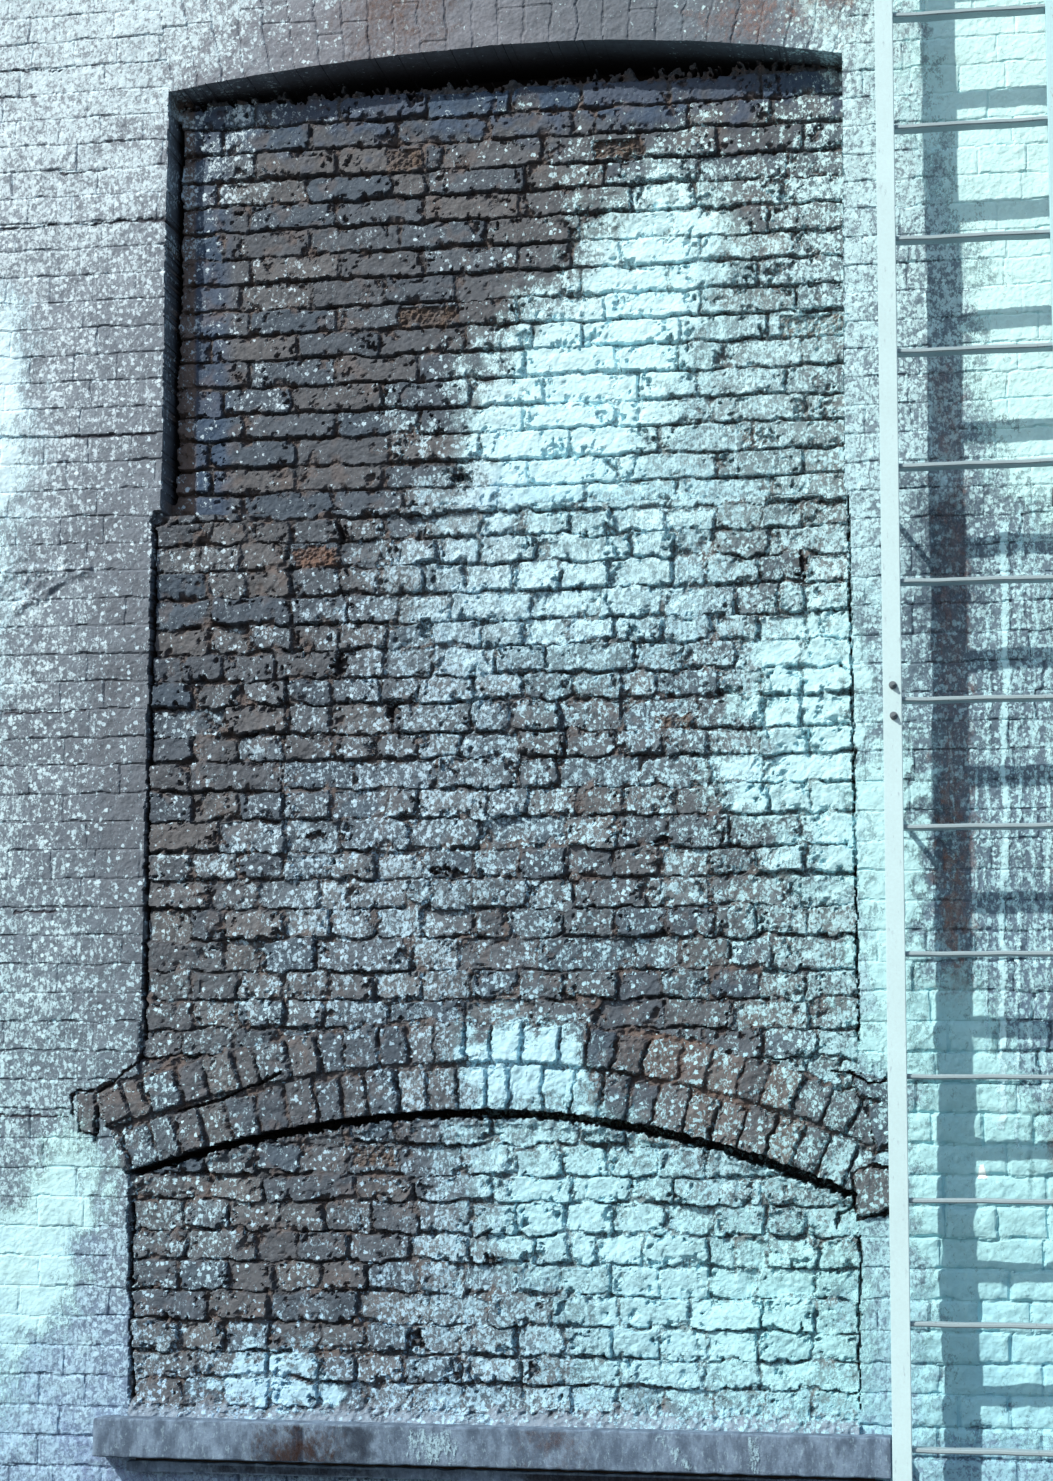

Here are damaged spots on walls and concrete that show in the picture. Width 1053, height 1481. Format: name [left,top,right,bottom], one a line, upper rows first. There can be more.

leakage [0,275,62,752]
crack [0,111,186,1144]
leakage [337,139,888,1082]
crack [830,494,888,1086]
leakage [893,0,1053,1479]
leakage [0,1106,135,1452]
crack [177,1070,282,1112]
leakage [393,1429,465,1481]
crack [124,1107,864,1410]
leakage [429,1003,891,1474]